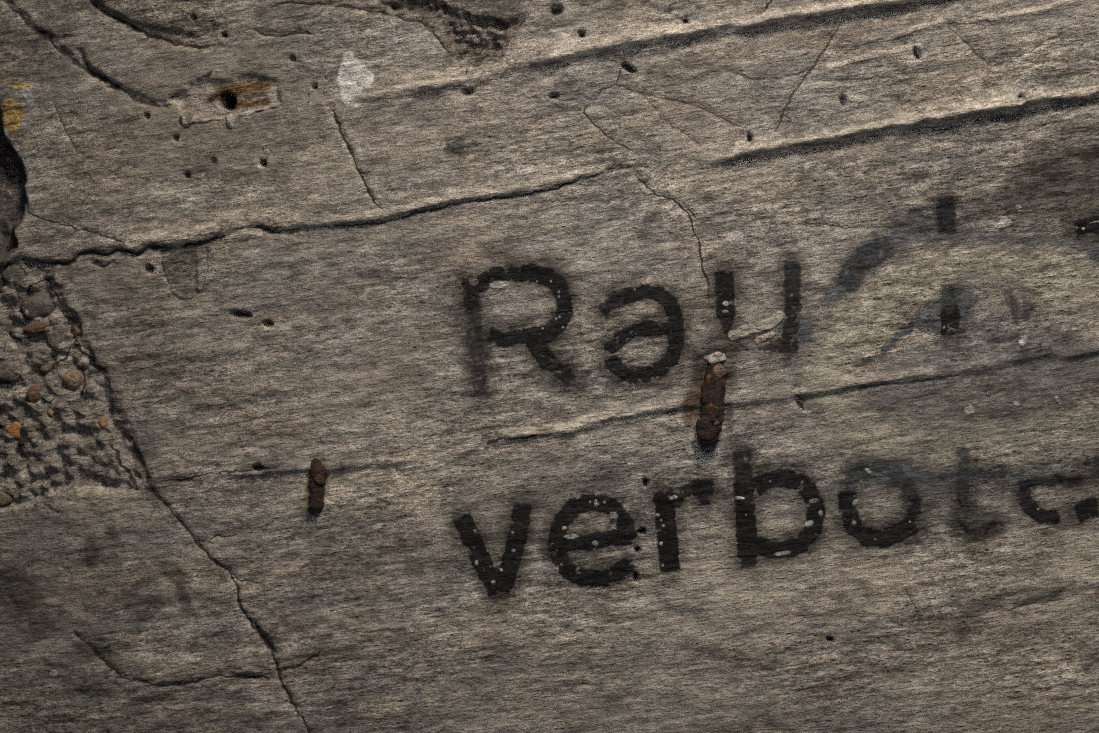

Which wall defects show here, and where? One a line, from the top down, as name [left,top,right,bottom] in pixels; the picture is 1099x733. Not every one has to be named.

crack [4,0,186,107]
crack [92,1,218,49]
crack [254,0,468,75]
rust [208,80,269,109]
crack [14,23,1067,307]
rust [684,364,727,426]
crack [74,437,321,733]